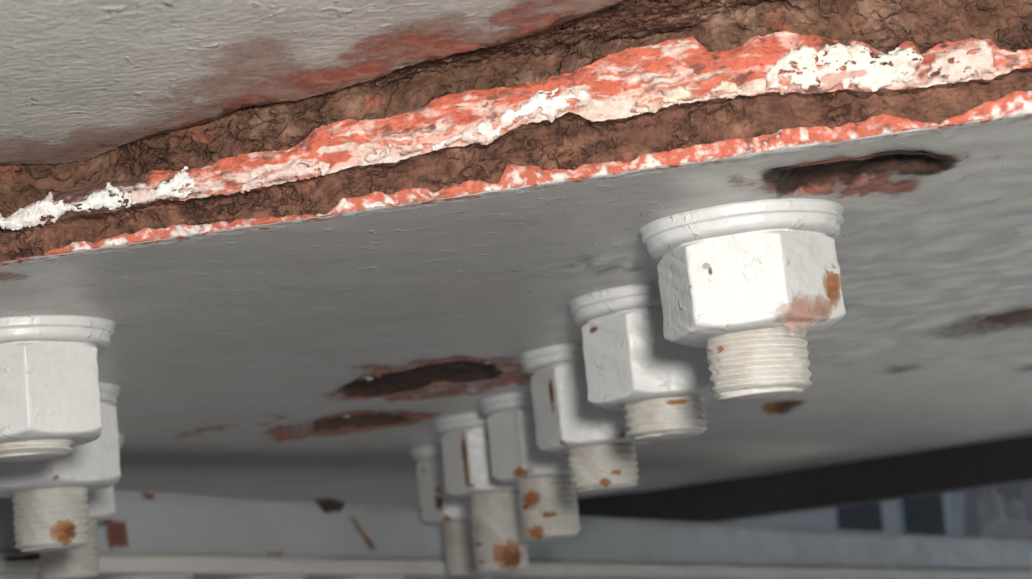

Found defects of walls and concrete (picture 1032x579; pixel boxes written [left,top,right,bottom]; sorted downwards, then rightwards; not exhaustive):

rust [0,0,622,165]
peeling [0,31,1032,281]
rust [0,67,1032,261]
rust [776,267,841,330]
rust [493,466,530,482]
rust [51,521,76,544]
rust [107,520,128,549]
rust [472,539,520,568]
rust [522,491,557,539]